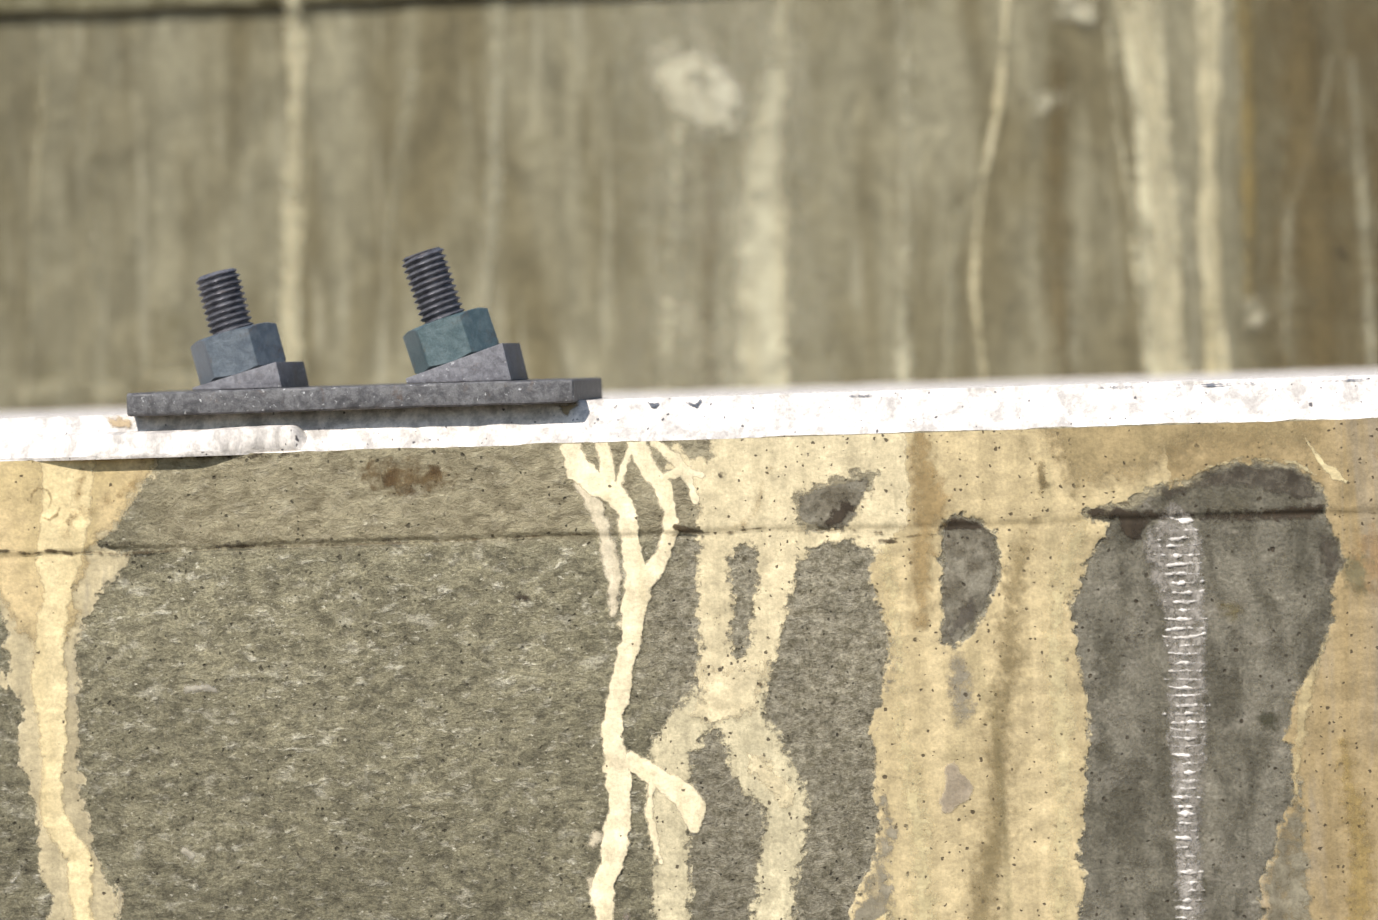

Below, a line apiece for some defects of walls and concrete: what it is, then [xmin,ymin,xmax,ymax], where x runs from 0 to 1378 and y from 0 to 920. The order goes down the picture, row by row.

leakage [0,458,160,920]
leakage [559,419,1378,920]